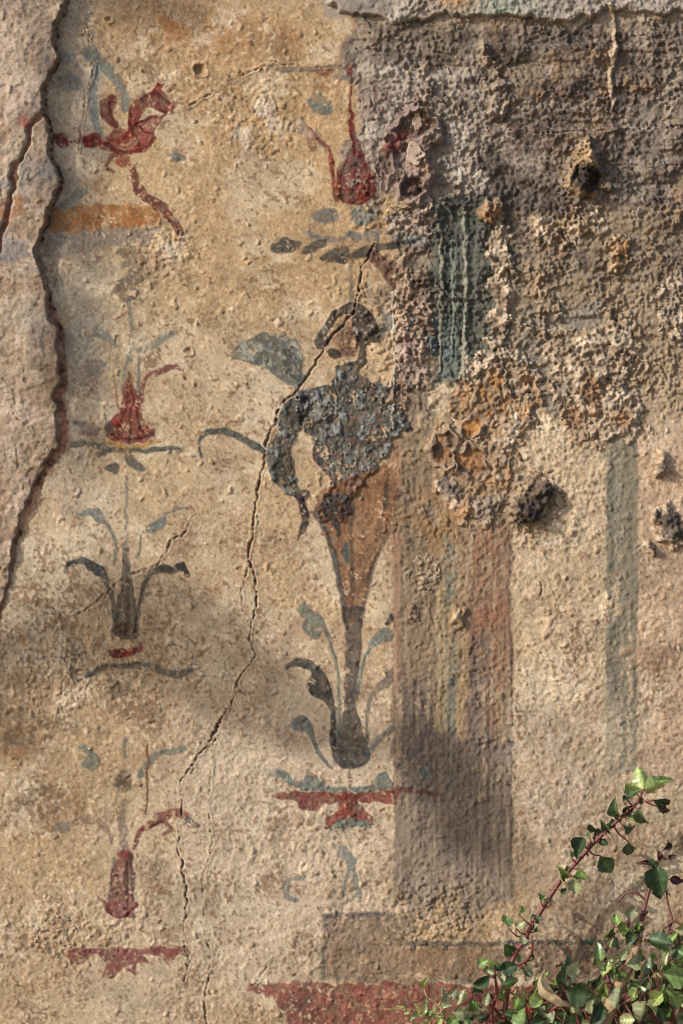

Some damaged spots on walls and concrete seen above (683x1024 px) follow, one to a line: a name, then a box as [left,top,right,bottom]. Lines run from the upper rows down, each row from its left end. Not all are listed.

flaking render [325,0,683,25]
flaking render [372,103,446,209]
crack [0,0,100,617]
flaking render [425,363,507,488]
crack [71,511,200,656]
crack [174,233,379,1024]